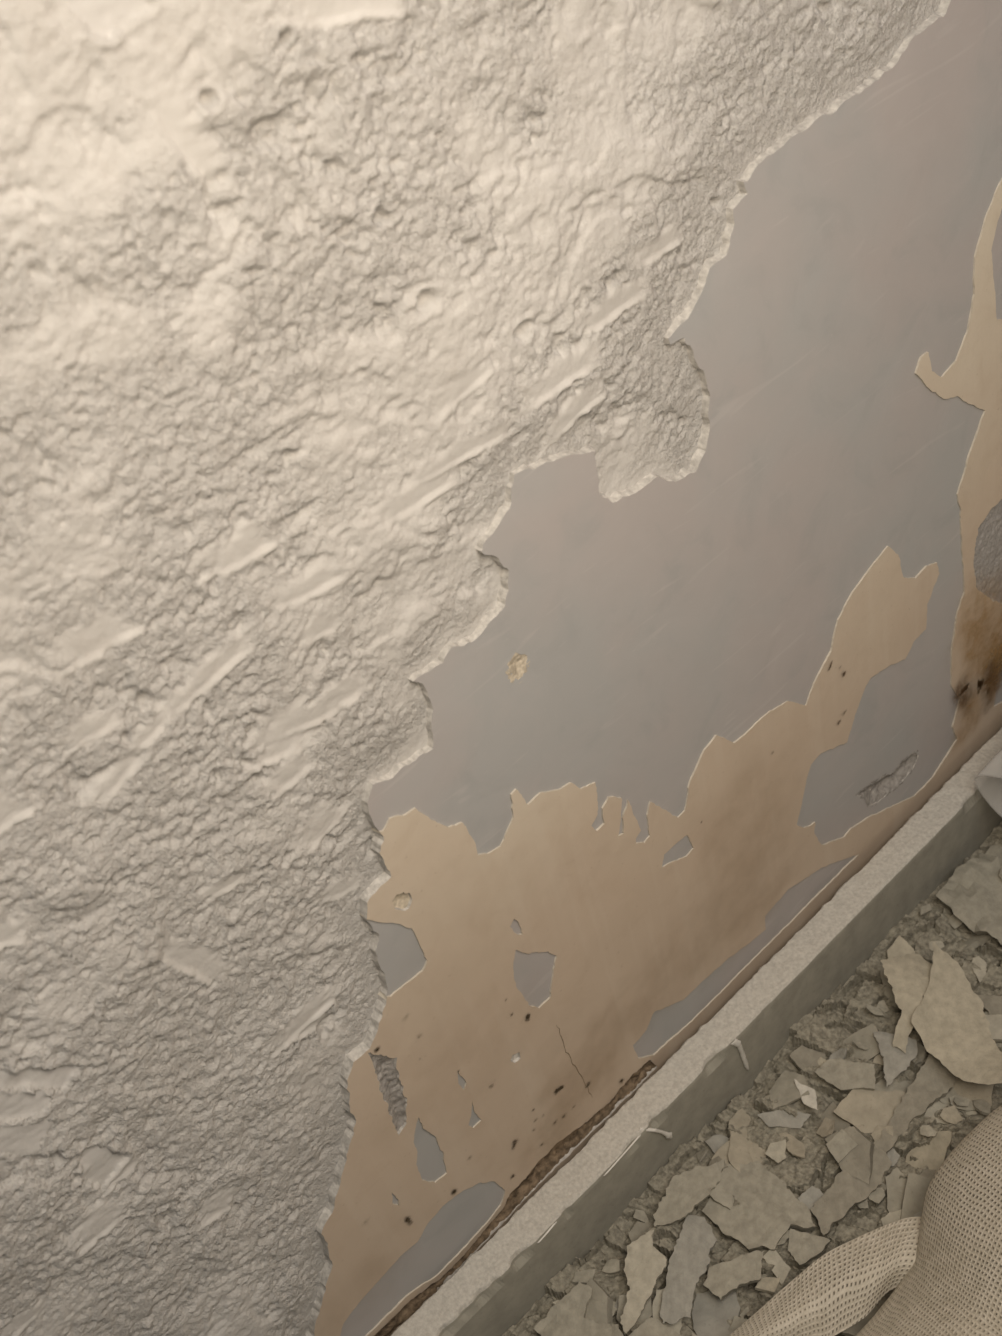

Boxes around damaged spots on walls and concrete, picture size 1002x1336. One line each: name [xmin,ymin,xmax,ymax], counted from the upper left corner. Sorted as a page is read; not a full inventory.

flaking render [63,0,147,38]
peeling [362,0,1002,854]
flaking render [0,1091,52,1122]
flaking render [0,1065,79,1091]
peeling [340,856,855,1336]
flaking render [534,935,1002,1336]